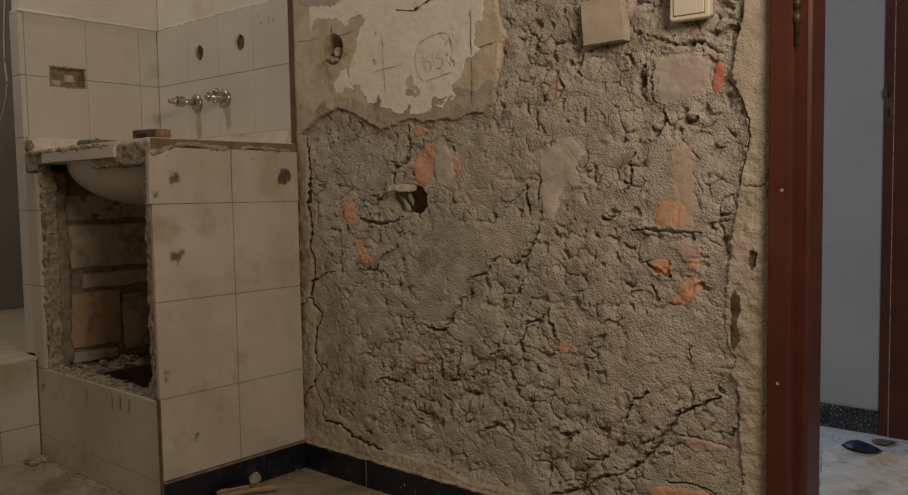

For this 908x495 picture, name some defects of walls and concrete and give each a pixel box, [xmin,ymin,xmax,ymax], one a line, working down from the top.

flaking render [64,147,298,365]
crack [302,144,383,450]
flaking render [296,0,751,495]
spalling [748,249,758,270]